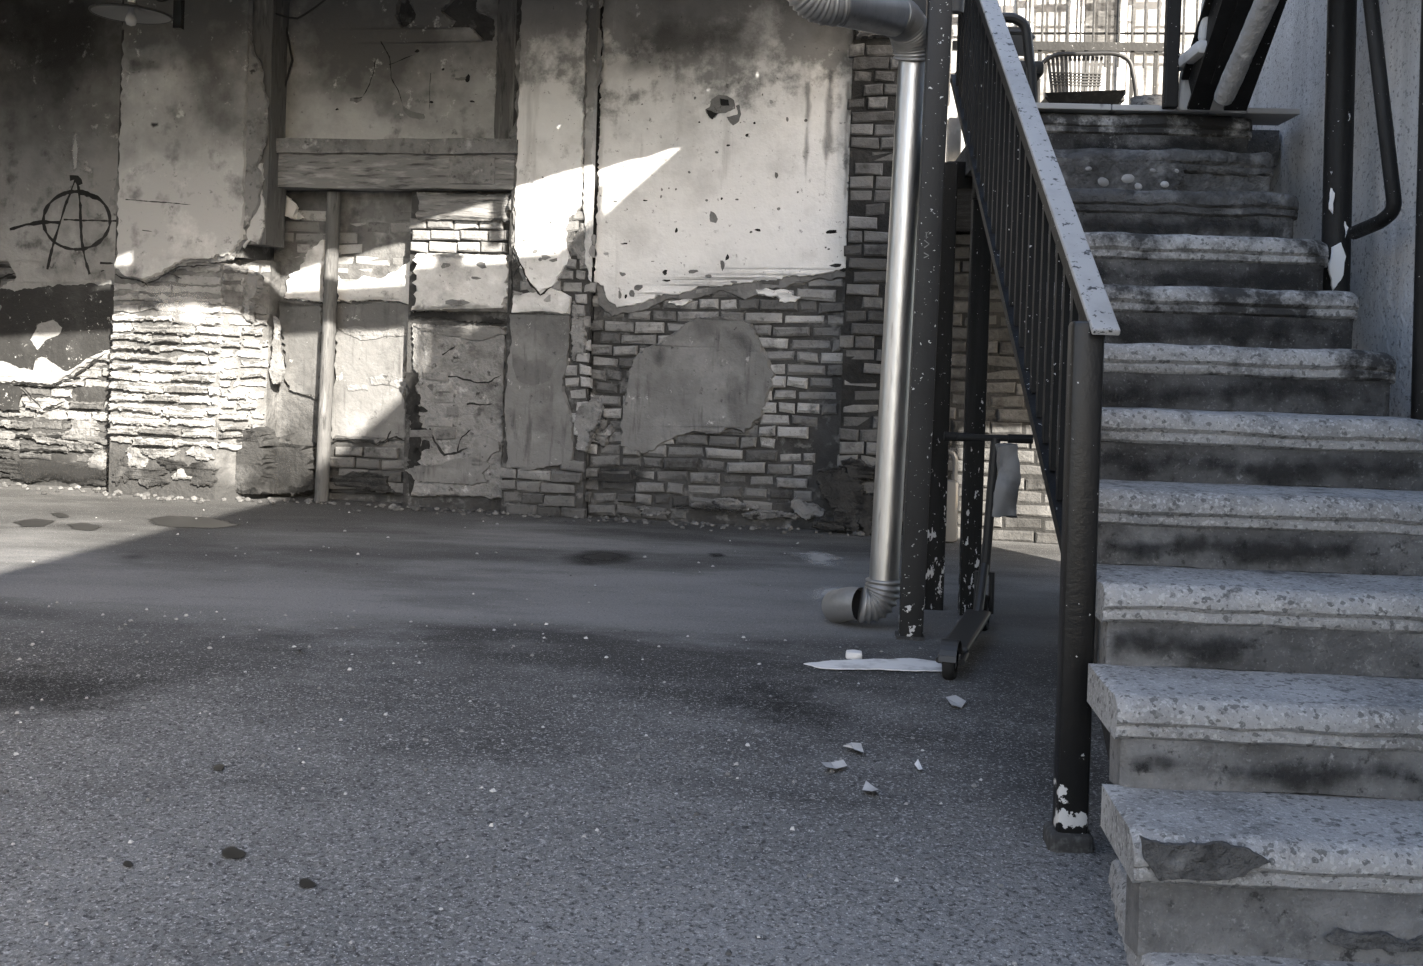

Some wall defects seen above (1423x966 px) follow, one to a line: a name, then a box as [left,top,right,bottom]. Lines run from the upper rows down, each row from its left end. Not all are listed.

flaking render [0,163,285,488]
flaking render [284,195,846,521]
spalling [1323,927,1423,952]